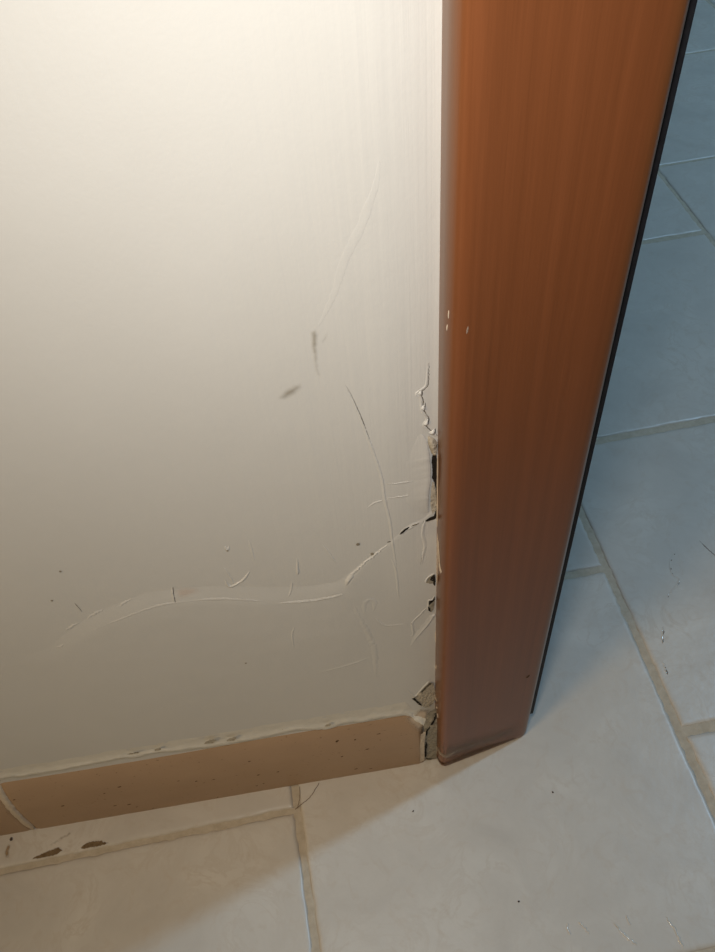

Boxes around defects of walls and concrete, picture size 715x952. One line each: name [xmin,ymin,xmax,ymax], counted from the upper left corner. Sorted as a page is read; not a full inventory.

spalling [410,541,442,647]
peeling [0,681,438,780]